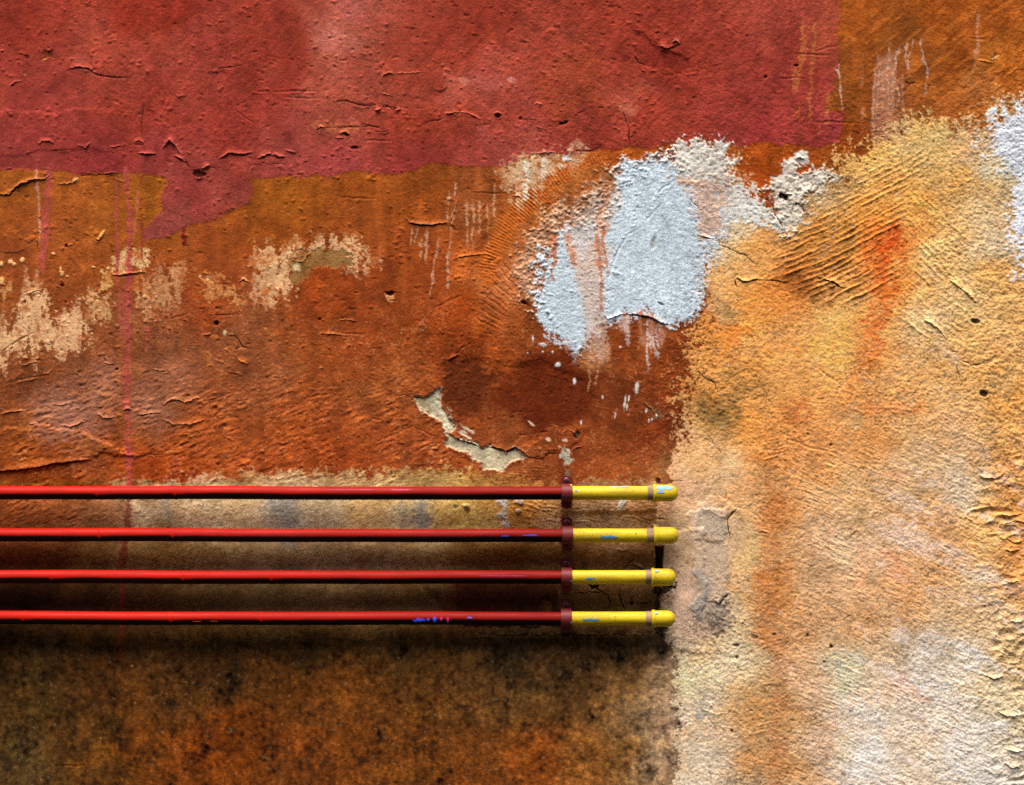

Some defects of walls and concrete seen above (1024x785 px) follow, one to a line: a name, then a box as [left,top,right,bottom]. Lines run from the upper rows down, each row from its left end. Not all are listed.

peeling [0,170,125,196]
peeling [37,137,90,151]
peeling [132,103,296,182]
water stain [10,164,212,486]
peeling [0,223,385,381]
crack [818,275,843,288]
flaking render [399,386,529,473]